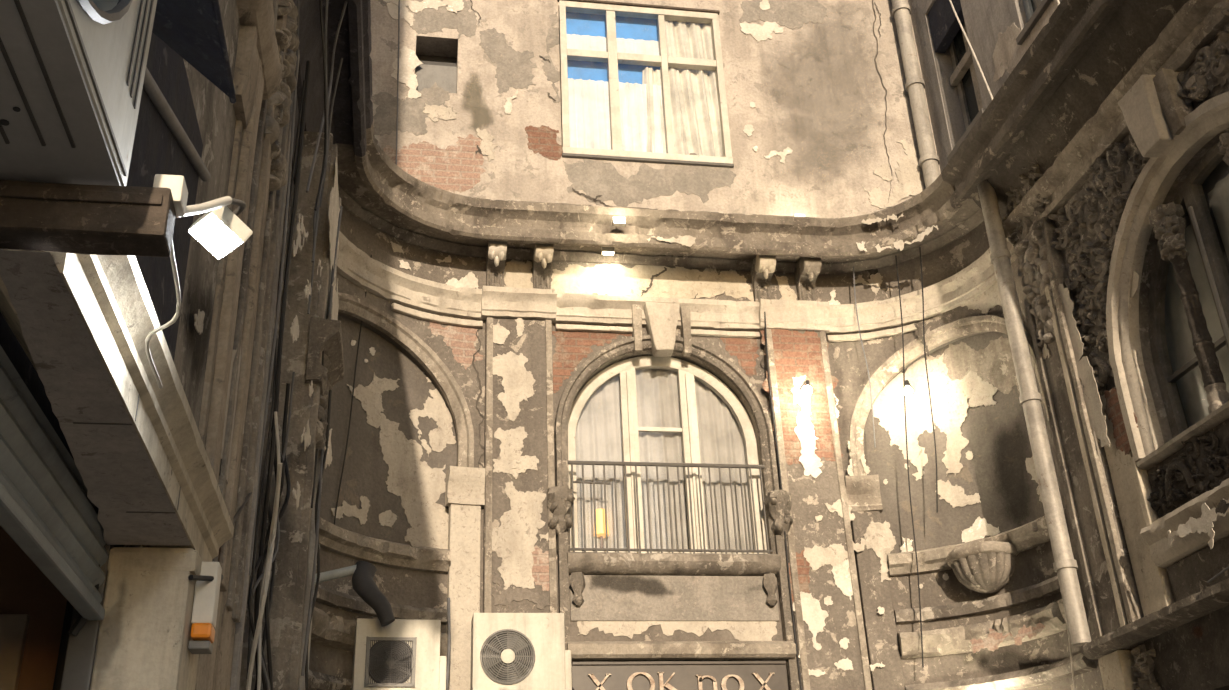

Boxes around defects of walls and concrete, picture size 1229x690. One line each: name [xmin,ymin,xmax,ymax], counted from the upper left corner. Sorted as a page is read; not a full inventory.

flaking render [371,46,497,193]
peeling [378,0,561,115]
peeling [525,125,736,207]
crack [872,0,892,201]
peeling [862,139,924,225]
peeling [856,225,938,252]
peeling [331,340,456,549]
peeling [428,318,558,591]
flaking render [720,328,870,478]
peeling [871,335,1020,543]
peeling [577,621,777,641]
peeling [788,521,913,677]